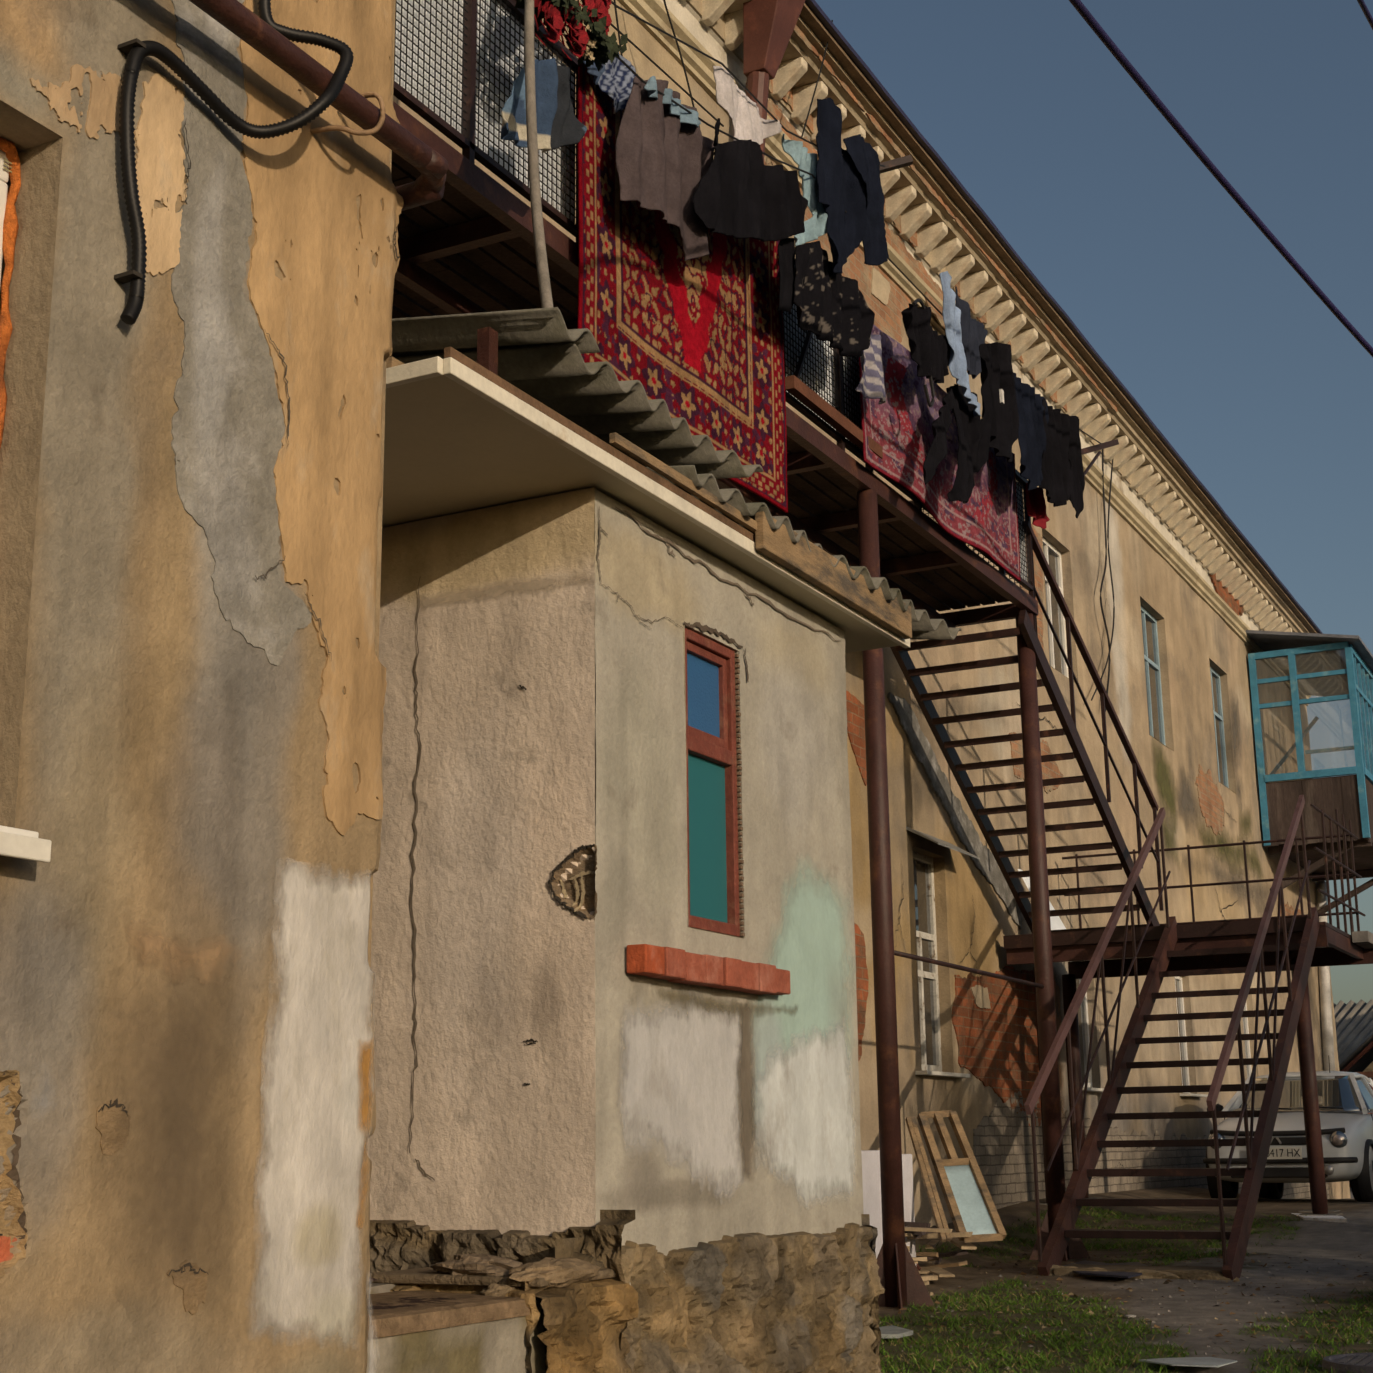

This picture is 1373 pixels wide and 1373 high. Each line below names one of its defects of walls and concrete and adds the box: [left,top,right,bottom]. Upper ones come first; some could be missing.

flaking render [244,0,400,124]
flaking render [29,64,187,276]
flaking render [239,39,404,836]
crack [409,576,435,1181]
spalling [0,1070,28,1278]
flaking render [951,966,1046,1209]
flaking render [1061,1110,1092,1189]
flaking render [1088,1126,1208,1194]
flaking render [1281,1182,1329,1199]